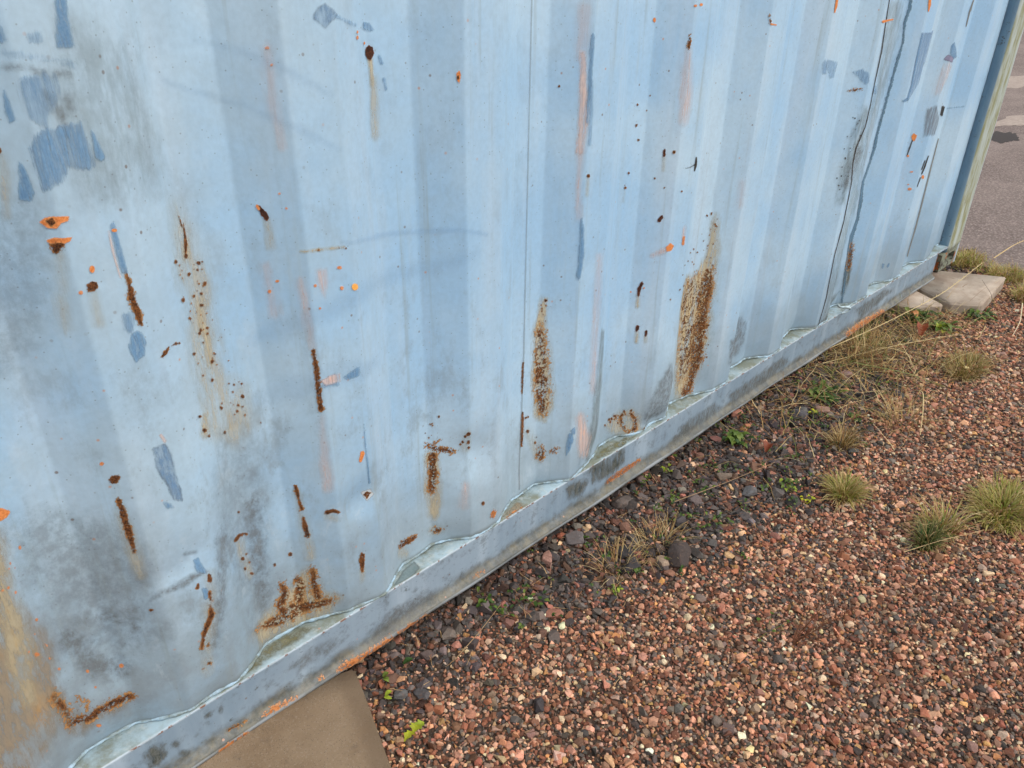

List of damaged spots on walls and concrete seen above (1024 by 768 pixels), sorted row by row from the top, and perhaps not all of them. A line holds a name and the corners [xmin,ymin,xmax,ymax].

peeling [40,216,72,254]
rust [124,273,144,326]
rust [174,216,246,437]
rust [670,212,718,398]
rust [311,348,325,412]
rust [520,299,553,447]
rust [604,409,645,434]
rust [115,497,141,575]
rust [194,558,215,650]
rust [254,485,340,643]